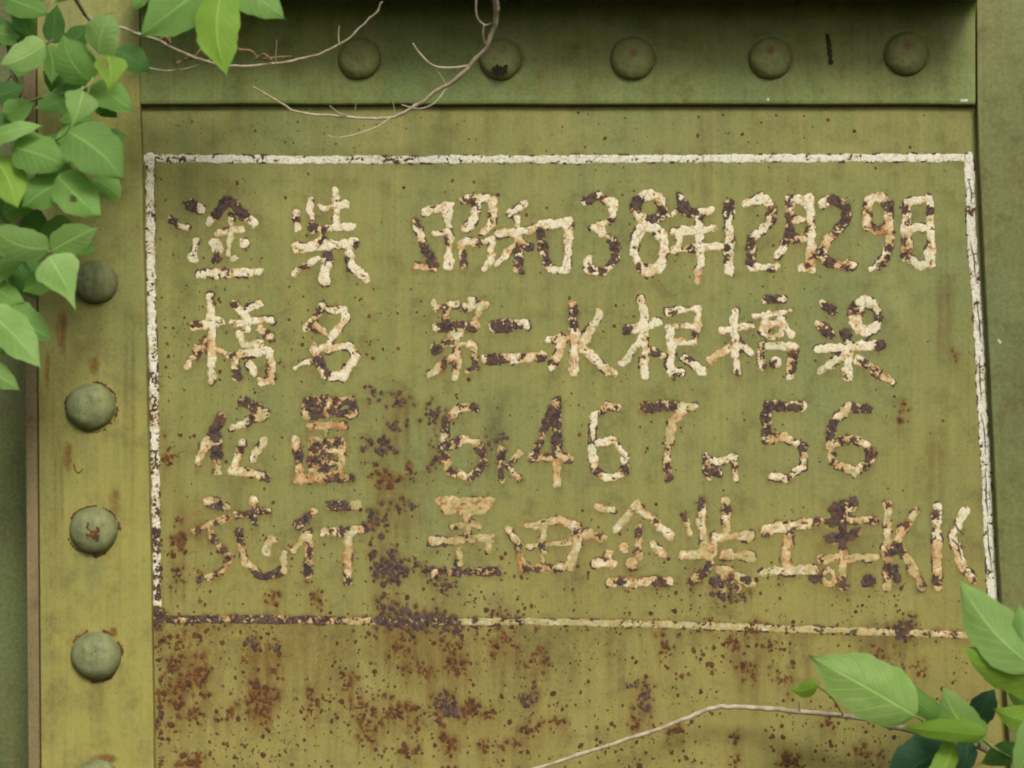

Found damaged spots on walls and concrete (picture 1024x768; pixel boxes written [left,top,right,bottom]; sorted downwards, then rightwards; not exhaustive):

peeling [292,216,360,274]
rust [153,307,208,411]
peeling [146,273,525,627]
rust [70,505,122,531]
rust [151,380,899,768]
peeling [539,618,960,639]
rust [819,575,927,684]